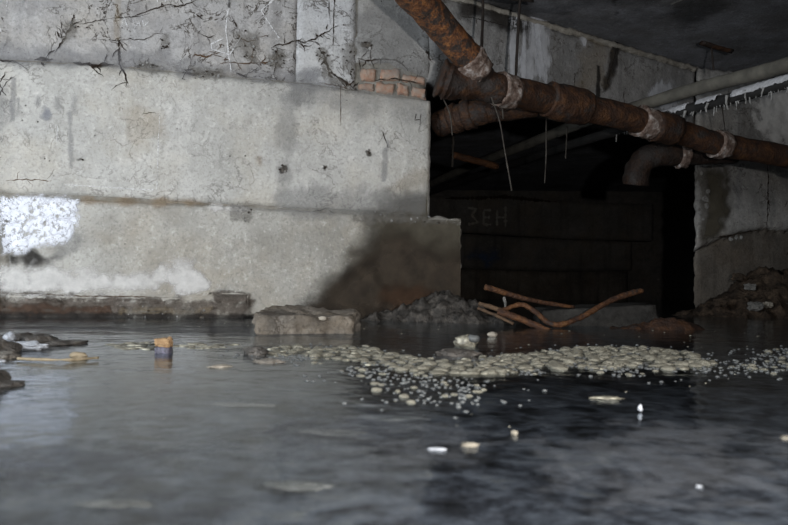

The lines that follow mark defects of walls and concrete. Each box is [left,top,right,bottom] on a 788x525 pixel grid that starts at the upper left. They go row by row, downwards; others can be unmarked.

crack [0,0,438,122]
damp [0,250,254,318]
damp [314,196,461,318]